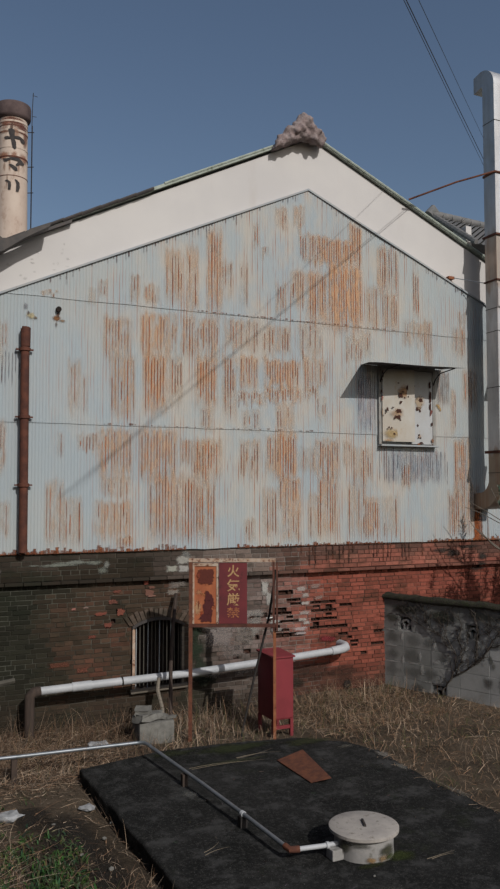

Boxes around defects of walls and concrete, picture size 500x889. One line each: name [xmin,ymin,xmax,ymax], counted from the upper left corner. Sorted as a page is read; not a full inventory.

rust [278,226,397,353]
rust [0,425,217,556]
rust [347,490,385,544]
rust [427,442,499,542]
spalling [233,590,383,659]